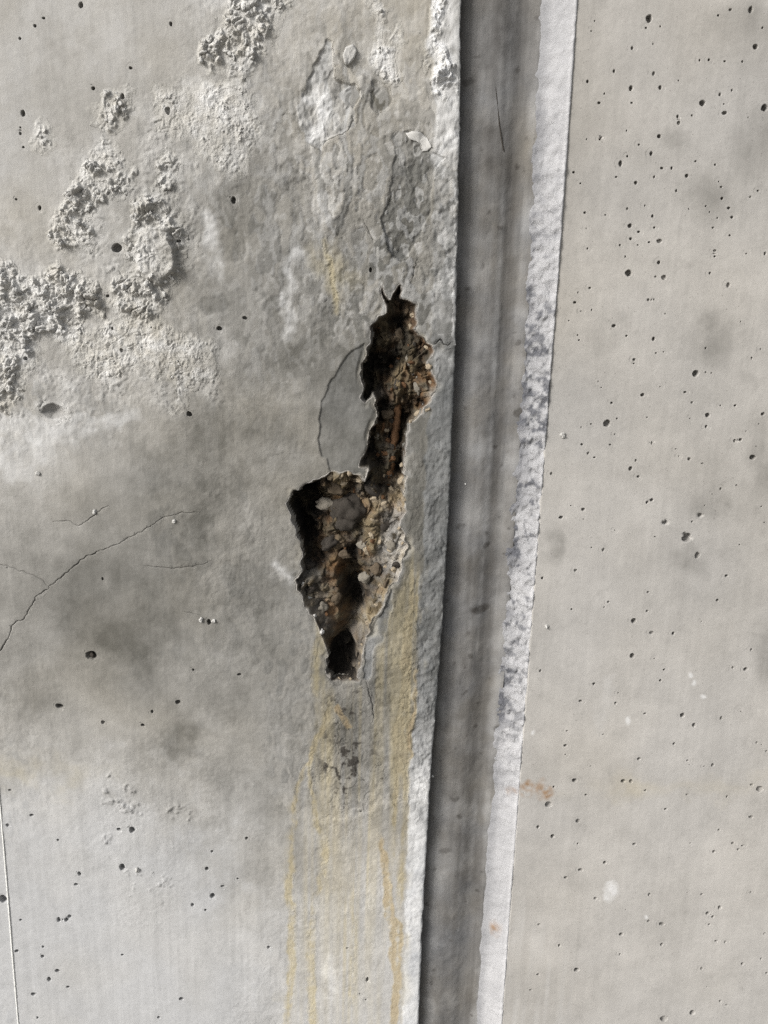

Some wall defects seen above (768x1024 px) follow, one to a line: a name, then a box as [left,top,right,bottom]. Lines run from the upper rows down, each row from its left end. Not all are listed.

flaking render [295,38,394,152]
spalling [415,0,456,75]
spalling [0,0,294,418]
flaking render [379,129,447,261]
spalling [285,283,438,683]
crack [0,504,201,654]
crack [143,560,214,571]
corrosion [271,545,432,1024]
corrosion [502,776,556,802]